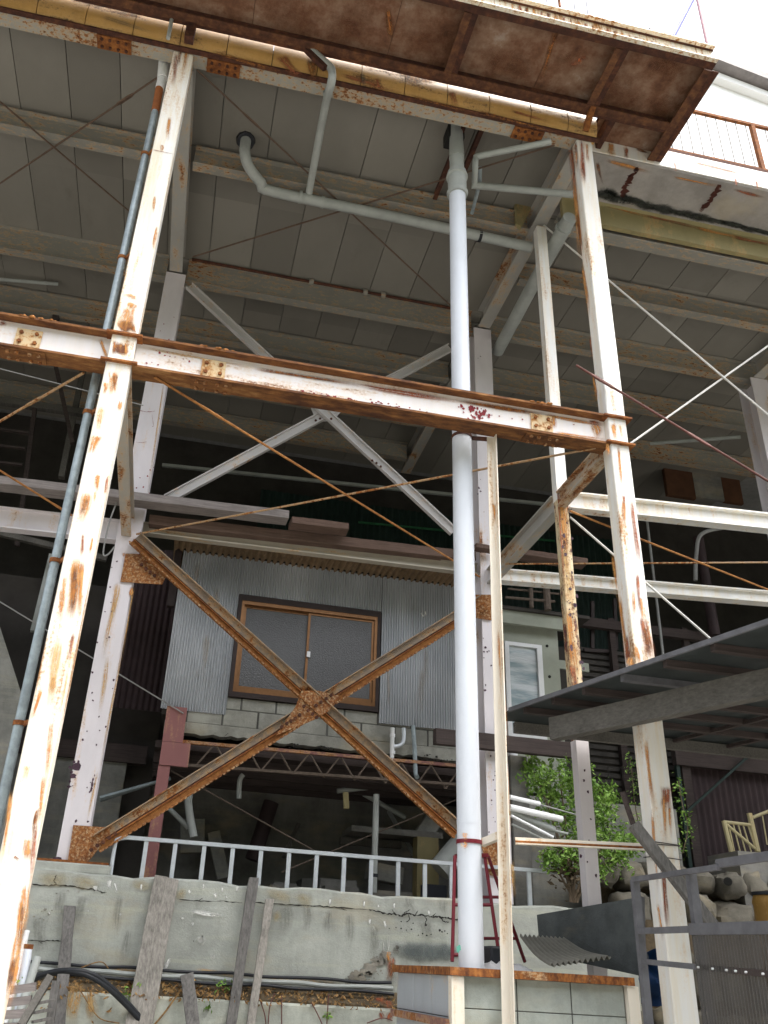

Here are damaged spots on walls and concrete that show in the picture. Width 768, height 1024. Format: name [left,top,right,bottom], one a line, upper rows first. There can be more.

rust [569,142,647,242]
damp [597,189,768,235]
rust [264,369,341,383]
rust [467,402,532,414]
rust [60,536,93,613]
rust [619,575,652,665]
rust [14,781,45,870]
crack [32,876,107,893]
crack [179,898,458,924]
rust [8,887,29,991]
spalling [345,945,399,984]
damp [403,939,451,959]